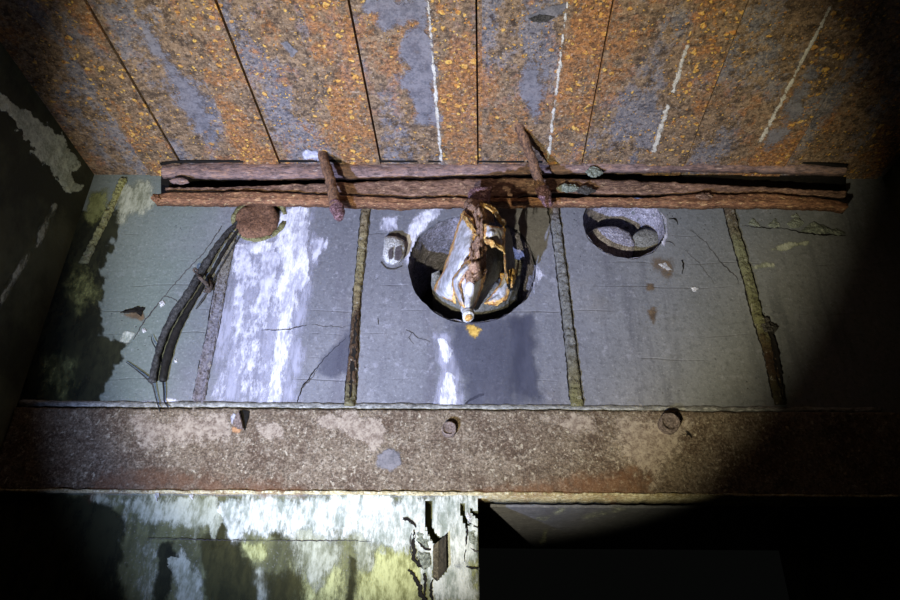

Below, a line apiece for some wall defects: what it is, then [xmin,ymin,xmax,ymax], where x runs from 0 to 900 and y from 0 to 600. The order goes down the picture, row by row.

peeling [0,93,84,193]
damp [213,206,328,403]
crack [268,324,346,402]
damp [0,493,487,600]
spalling [466,512,477,546]